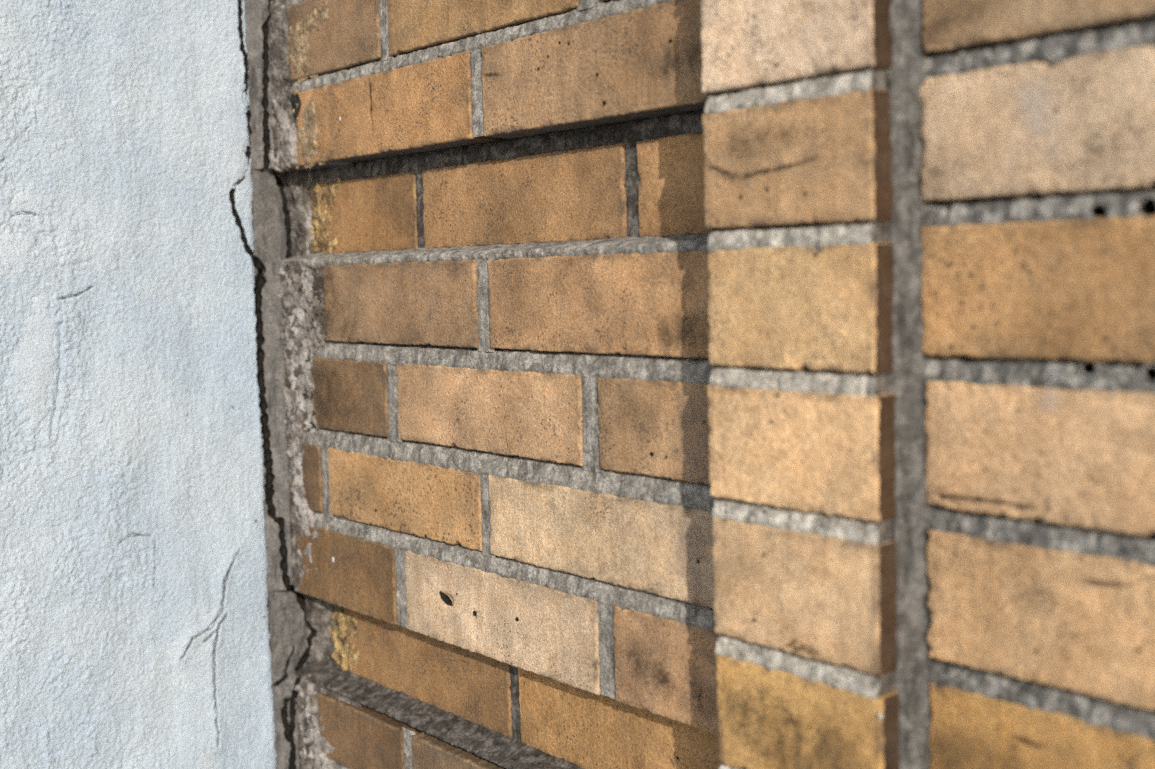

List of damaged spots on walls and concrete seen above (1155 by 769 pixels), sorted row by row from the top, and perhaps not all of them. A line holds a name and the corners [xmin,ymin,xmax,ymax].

crack [181,549,240,746]
crack [229,0,317,769]